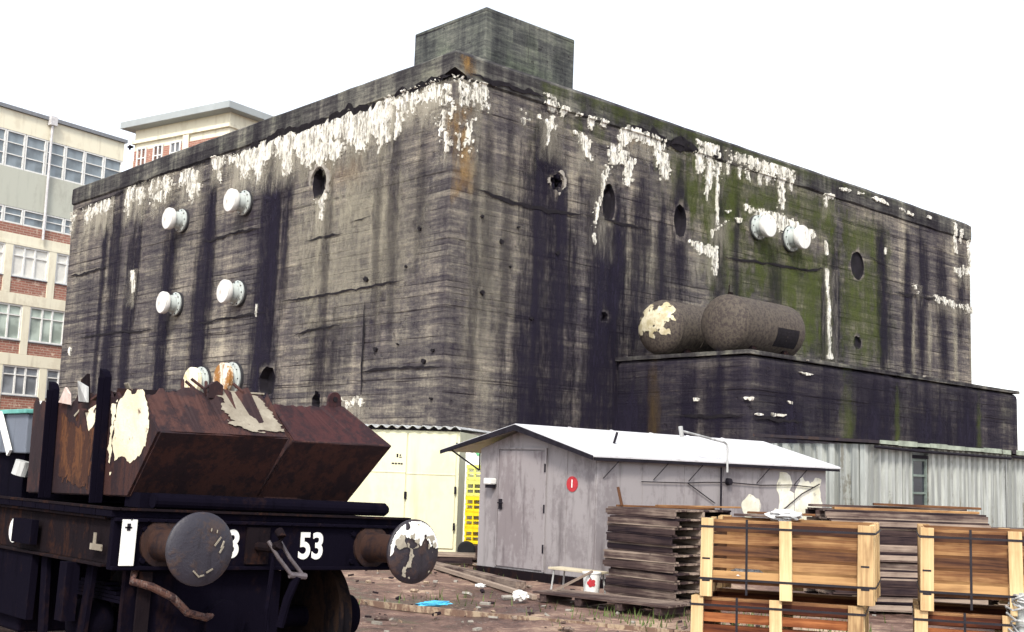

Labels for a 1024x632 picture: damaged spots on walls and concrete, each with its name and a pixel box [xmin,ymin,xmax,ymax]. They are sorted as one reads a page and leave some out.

crack [79,73,543,210]
leakage [91,214,141,393]
leakage [153,312,170,391]
leakage [161,228,176,295]
leakage [185,186,216,372]
leakage [249,162,292,403]
crack [477,189,650,294]
leakage [503,117,834,443]
leakage [756,225,890,370]
leakage [845,382,899,444]
leakage [903,229,972,380]
leakage [913,392,977,450]